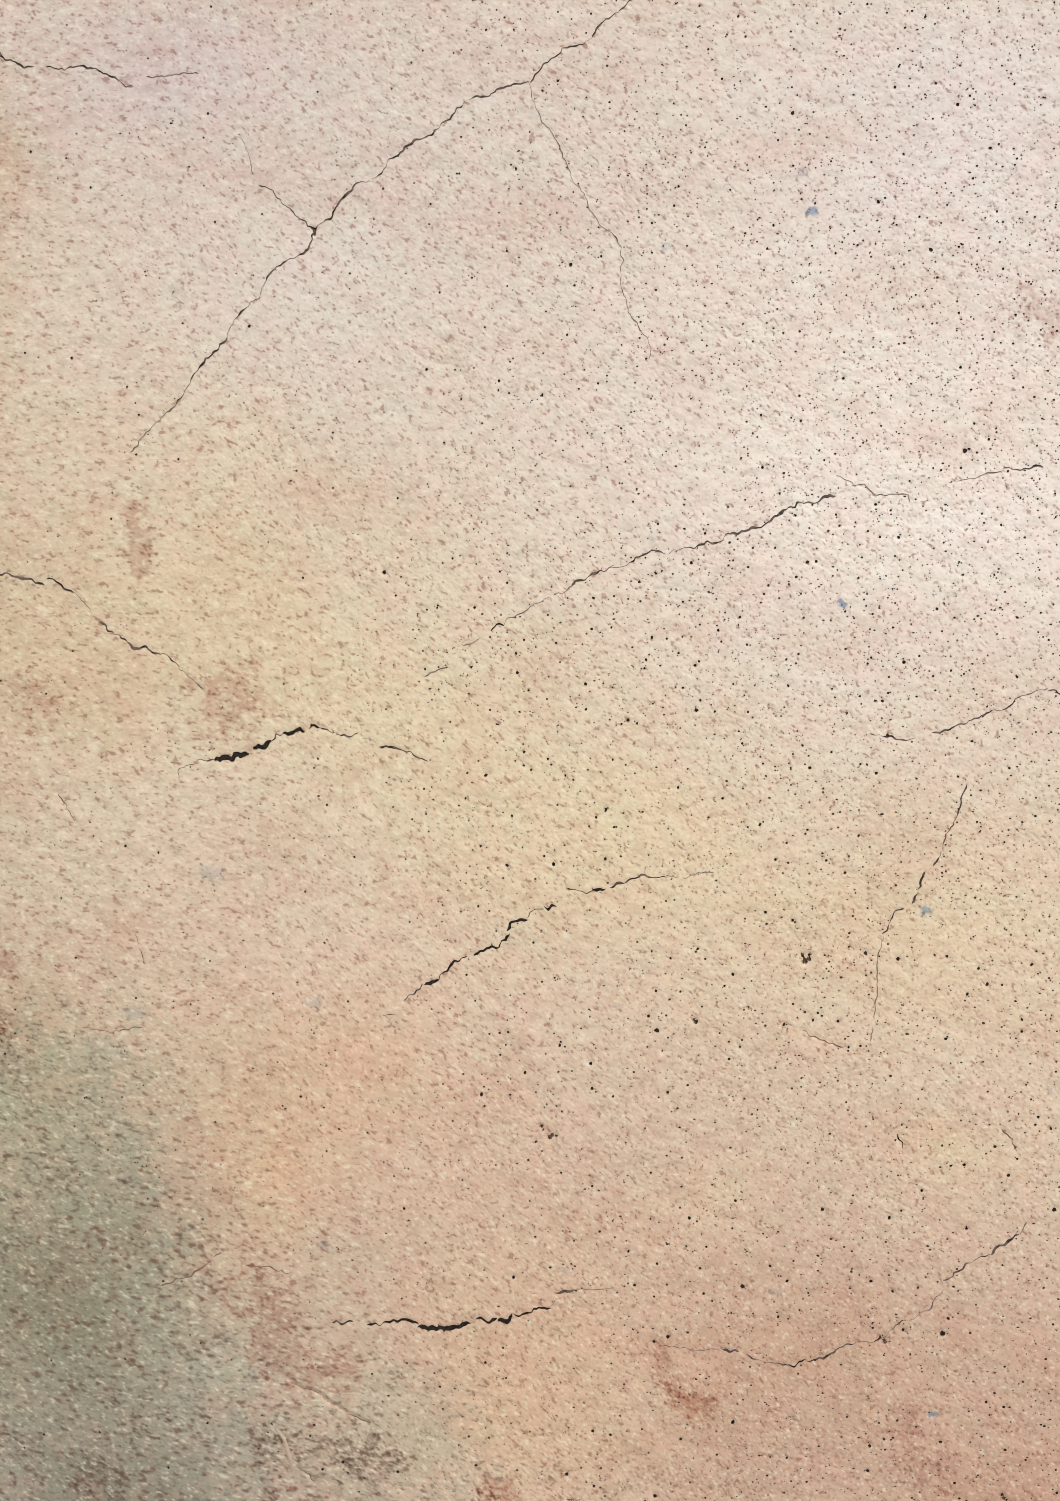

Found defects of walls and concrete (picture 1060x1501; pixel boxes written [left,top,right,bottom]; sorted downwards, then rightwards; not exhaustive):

crack [0,52,197,87]
crack [131,0,651,452]
crack [959,464,1043,481]
crack [0,572,204,690]
crack [424,476,910,677]
crack [178,724,427,775]
crack [375,871,713,1018]
crack [332,1288,612,1331]
crack [656,1222,1027,1368]